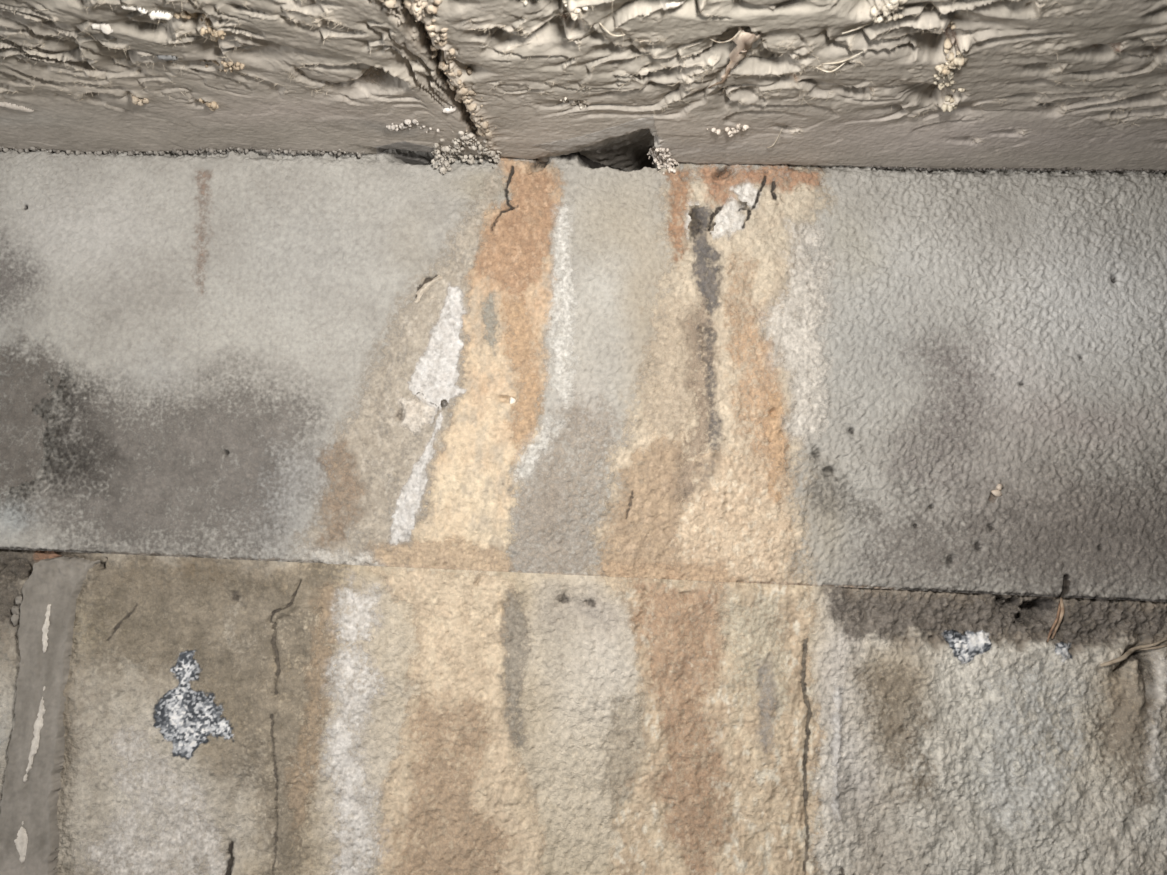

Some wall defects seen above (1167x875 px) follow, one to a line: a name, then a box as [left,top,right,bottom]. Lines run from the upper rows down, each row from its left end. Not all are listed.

crack [492,166,515,230]
rust [299,157,832,875]
rust [286,583,337,841]